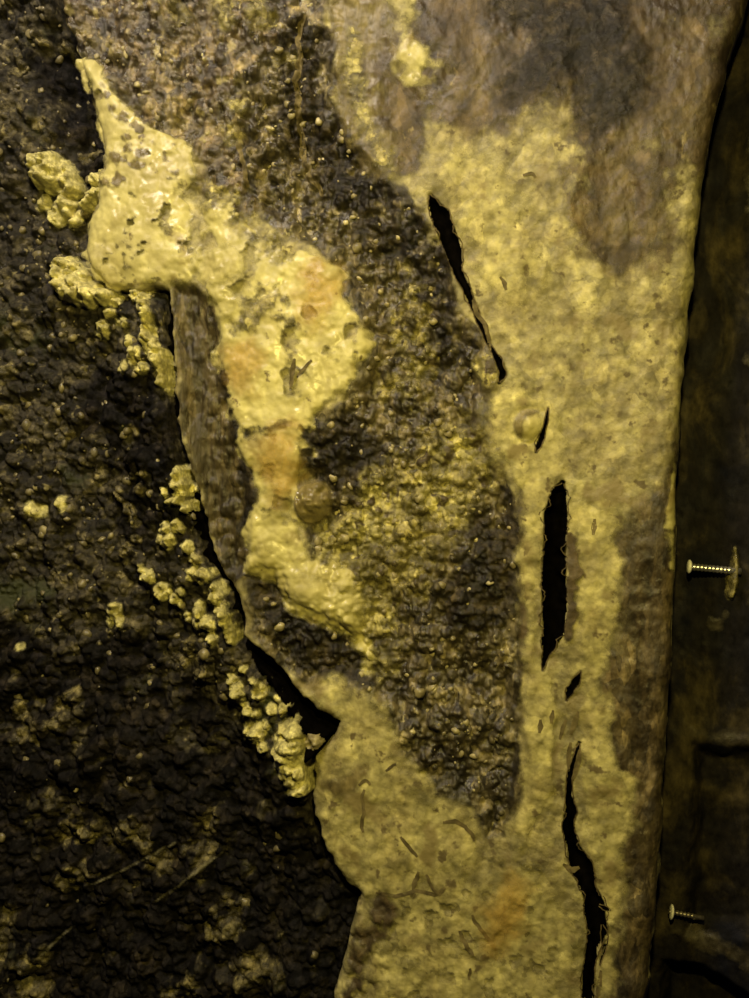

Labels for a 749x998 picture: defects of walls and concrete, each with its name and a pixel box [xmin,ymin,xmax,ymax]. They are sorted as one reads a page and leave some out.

water stain [157,0,194,30]
water stain [209,0,278,31]
flaking render [0,197,79,281]
spalling [58,0,493,498]
crack [428,194,507,383]
water stain [273,0,747,407]
crack [246,638,319,729]
water stain [0,34,586,998]
spalling [297,435,366,568]
spalling [244,462,524,838]
crack [538,483,597,670]
crack [537,671,611,998]